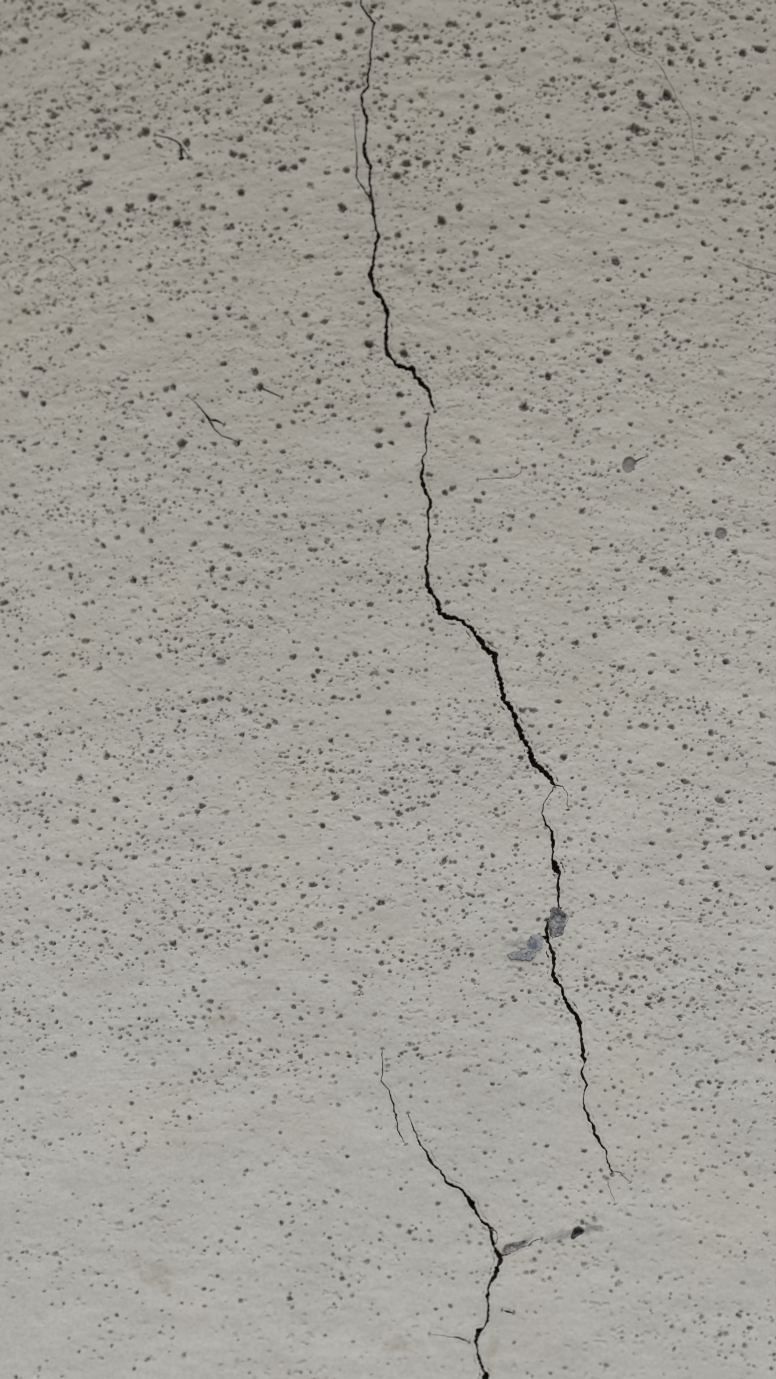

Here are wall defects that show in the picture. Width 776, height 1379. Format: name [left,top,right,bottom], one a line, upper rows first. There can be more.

crack [351,0,631,1204]
crack [378,1050,541,1379]